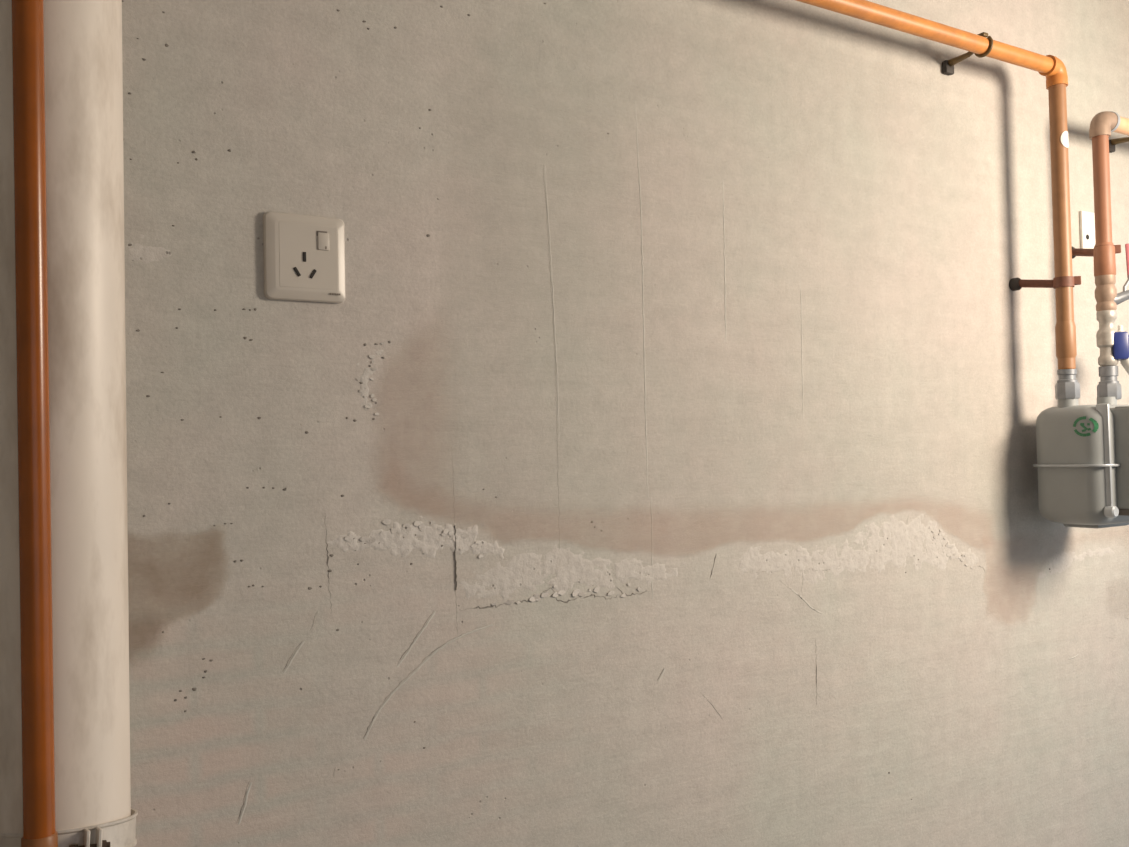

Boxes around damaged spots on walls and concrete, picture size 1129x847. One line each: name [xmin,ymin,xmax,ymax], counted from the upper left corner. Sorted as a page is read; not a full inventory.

crack [451,465,459,642]